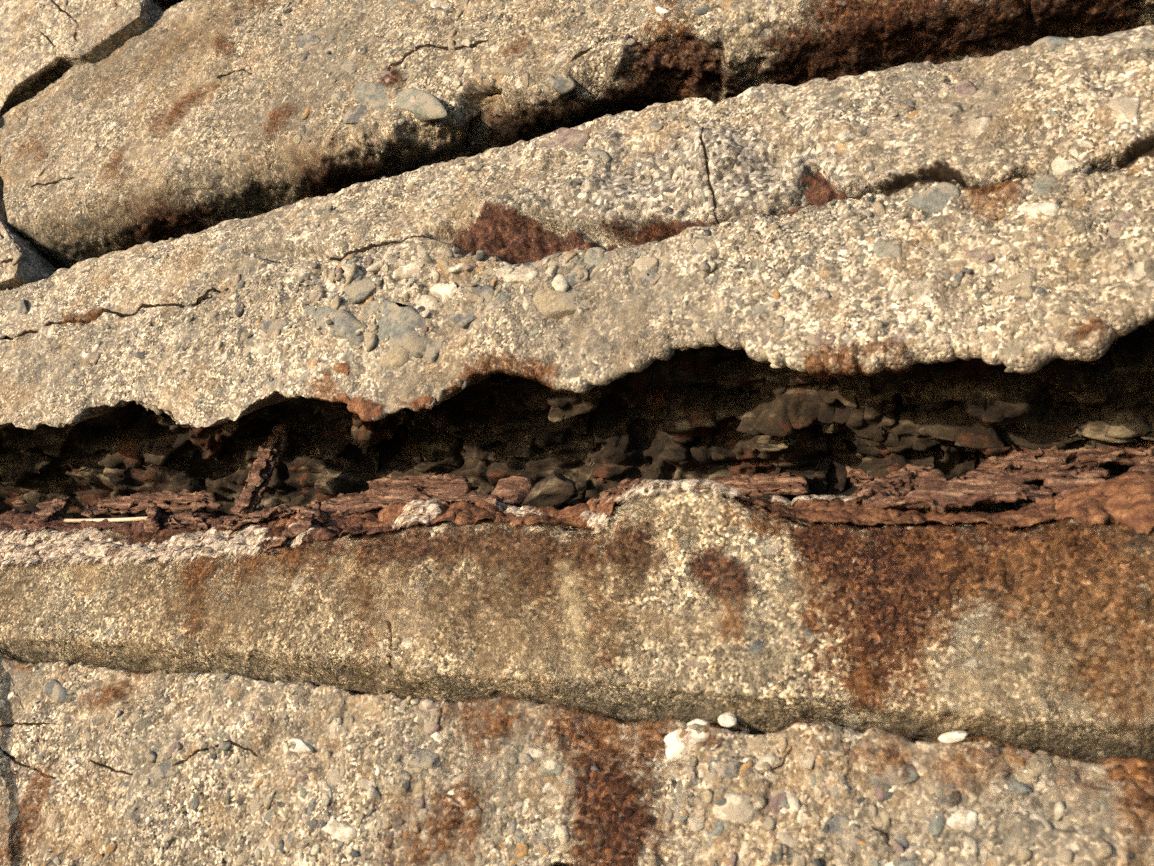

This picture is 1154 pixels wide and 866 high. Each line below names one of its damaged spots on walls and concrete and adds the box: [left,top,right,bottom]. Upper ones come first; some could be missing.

crack [40,0,78,51]
rust [484,0,1142,146]
crack [31,177,74,187]
crack [699,126,720,224]
crack [848,161,1027,200]
crack [1084,133,1154,174]
spalling [0,0,1154,602]
rust [592,478,663,509]
rust [677,472,1154,729]
rust [384,777,482,866]
crack [548,858,577,866]
rust [535,703,718,866]